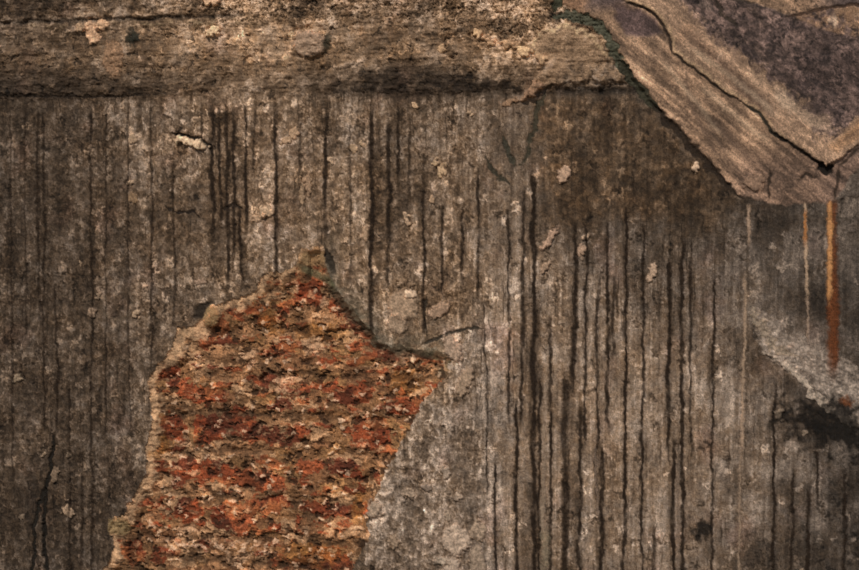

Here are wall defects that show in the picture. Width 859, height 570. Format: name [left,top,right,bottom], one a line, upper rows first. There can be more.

flaking render [173,133,214,156]
flaking render [557,165,571,183]
flaking render [562,0,859,208]
crack [625,0,859,199]
rust [827,201,839,365]
spalling [103,246,474,570]
crack [30,434,55,570]